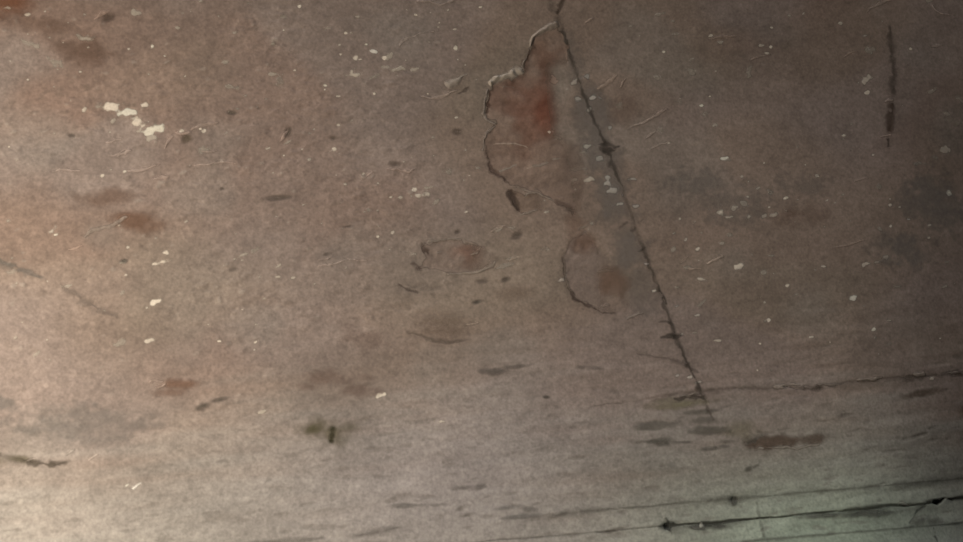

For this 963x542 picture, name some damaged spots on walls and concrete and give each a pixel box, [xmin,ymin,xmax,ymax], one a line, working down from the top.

crack [557,0,639,208]
peeling [506,188,554,215]
crack [643,249,714,420]
crack [664,497,963,531]